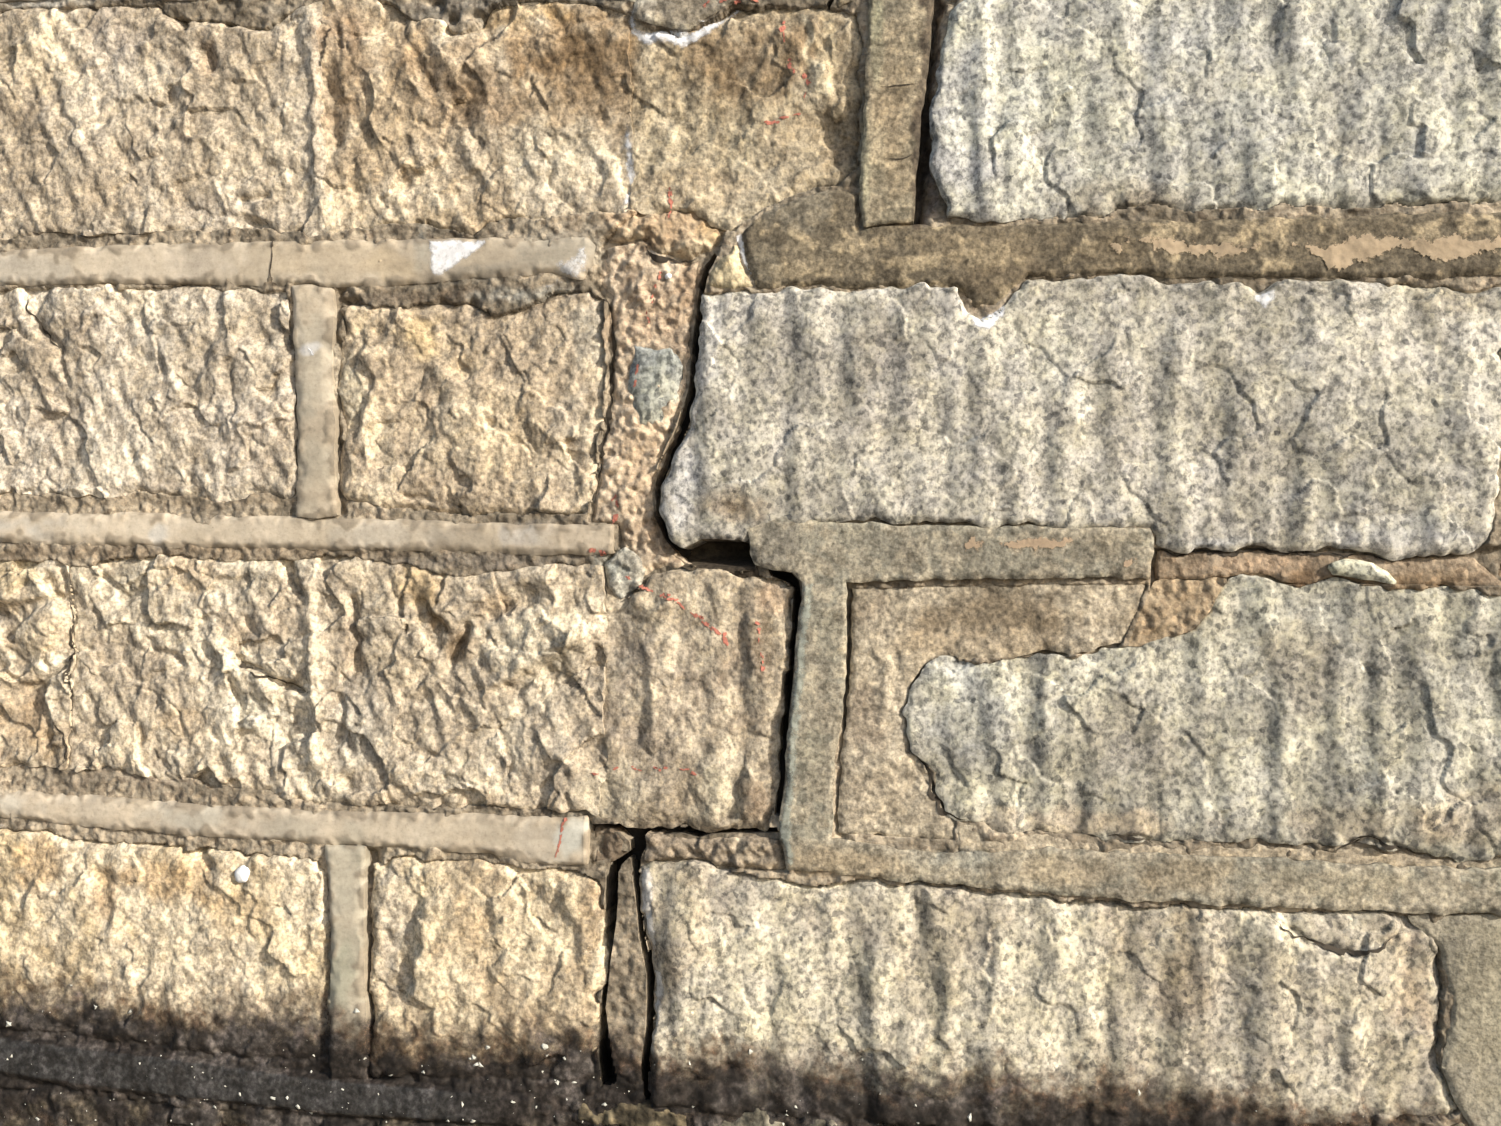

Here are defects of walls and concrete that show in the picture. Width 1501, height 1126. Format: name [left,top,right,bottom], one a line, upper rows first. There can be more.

crack [646,246,705,482]
crack [53,602,76,767]
crack [615,520,801,921]
crack [606,1012,656,1074]
damp [0,974,1438,1126]